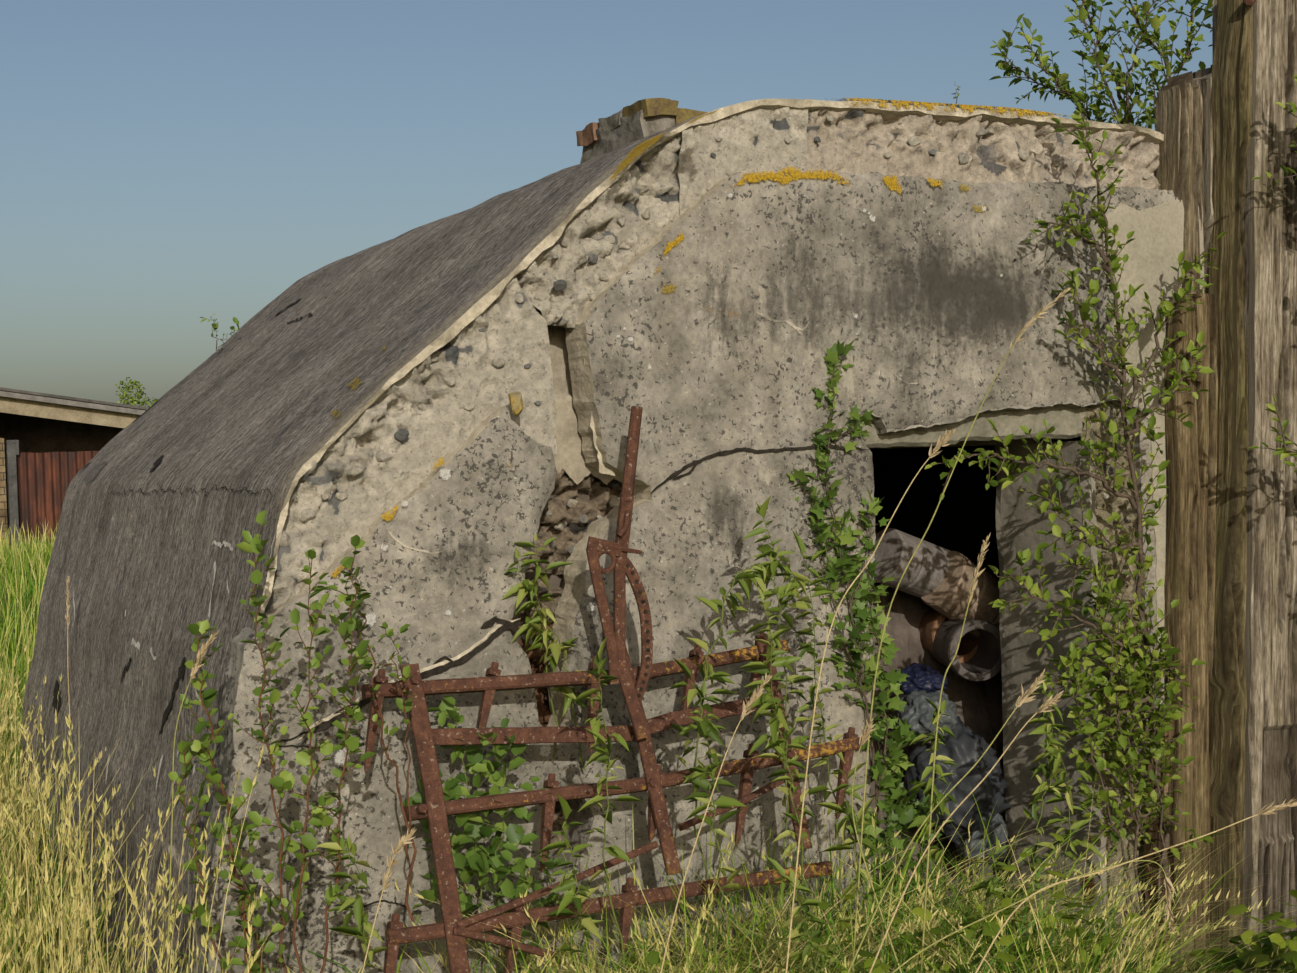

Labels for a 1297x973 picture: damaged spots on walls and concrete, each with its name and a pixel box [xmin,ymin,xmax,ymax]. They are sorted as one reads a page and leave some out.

spalling [260,99,1204,953]
crack [650,439,868,494]
crack [279,617,533,748]